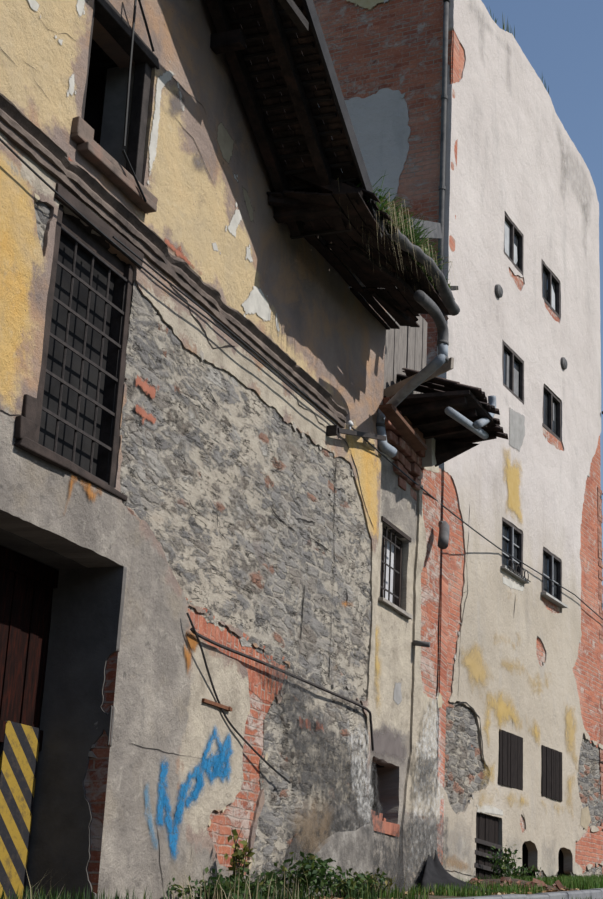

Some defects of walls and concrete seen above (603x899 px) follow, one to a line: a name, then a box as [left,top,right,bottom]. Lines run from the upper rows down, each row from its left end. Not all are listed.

peeling [76,0,85,17]
peeling [147,70,184,184]
spalling [314,0,465,223]
spalling [420,314,437,365]
spalling [84,651,118,894]
spalling [120,281,371,882]
spalling [420,468,506,866]
spalling [570,436,603,877]